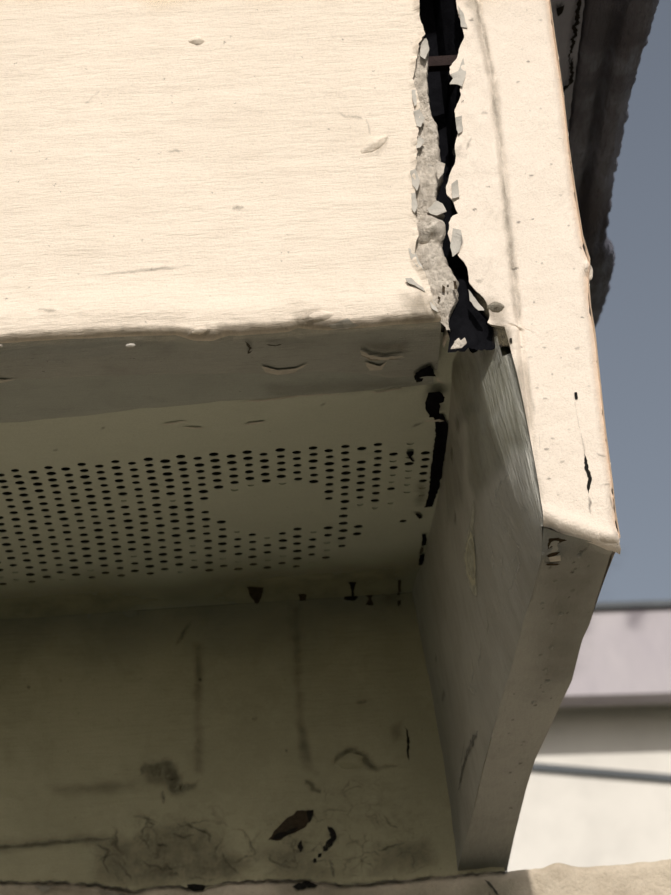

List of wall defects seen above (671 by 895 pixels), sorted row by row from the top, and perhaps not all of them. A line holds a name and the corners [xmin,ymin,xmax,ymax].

crack [556,0,582,92]
peeling [410,38,459,223]
peeling [455,116,463,134]
crack [419,0,512,353]
peeling [405,233,504,347]
spalling [269,810,314,840]